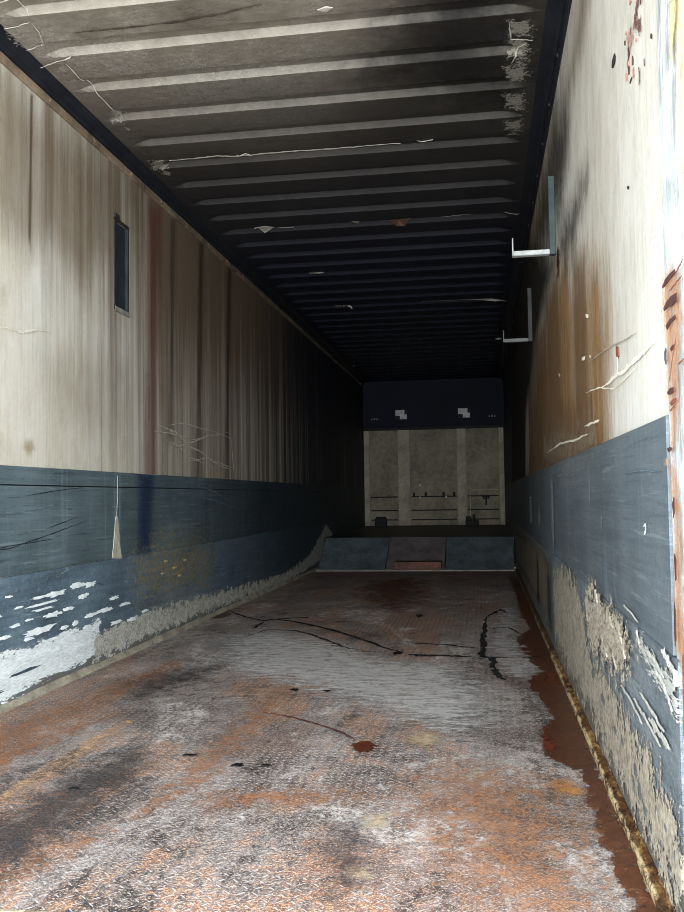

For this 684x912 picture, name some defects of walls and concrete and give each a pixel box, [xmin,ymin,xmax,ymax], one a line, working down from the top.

water stain [511,112,610,482]
rust [0,665,174,799]
peeling [0,524,332,704]
rust [136,673,375,817]
crack [227,609,539,680]
rust [407,577,657,912]
peeling [552,563,684,912]
rust [661,259,684,737]